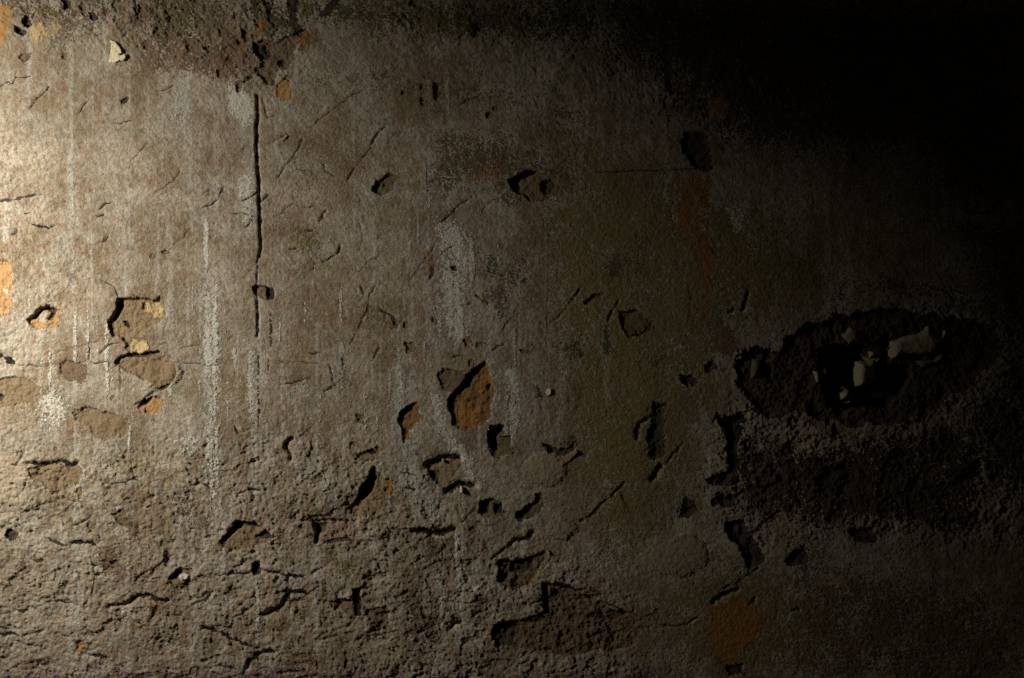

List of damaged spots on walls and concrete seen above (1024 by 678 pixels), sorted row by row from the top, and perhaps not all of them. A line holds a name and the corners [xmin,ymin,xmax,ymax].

spalling [372,173,399,196]
spalling [508,170,562,201]
crack [175,76,398,391]
spalling [0,259,13,316]
spalling [27,304,61,330]
spalling [108,296,178,415]
spalling [398,402,423,441]
spalling [436,361,512,459]
spalling [715,308,1003,473]